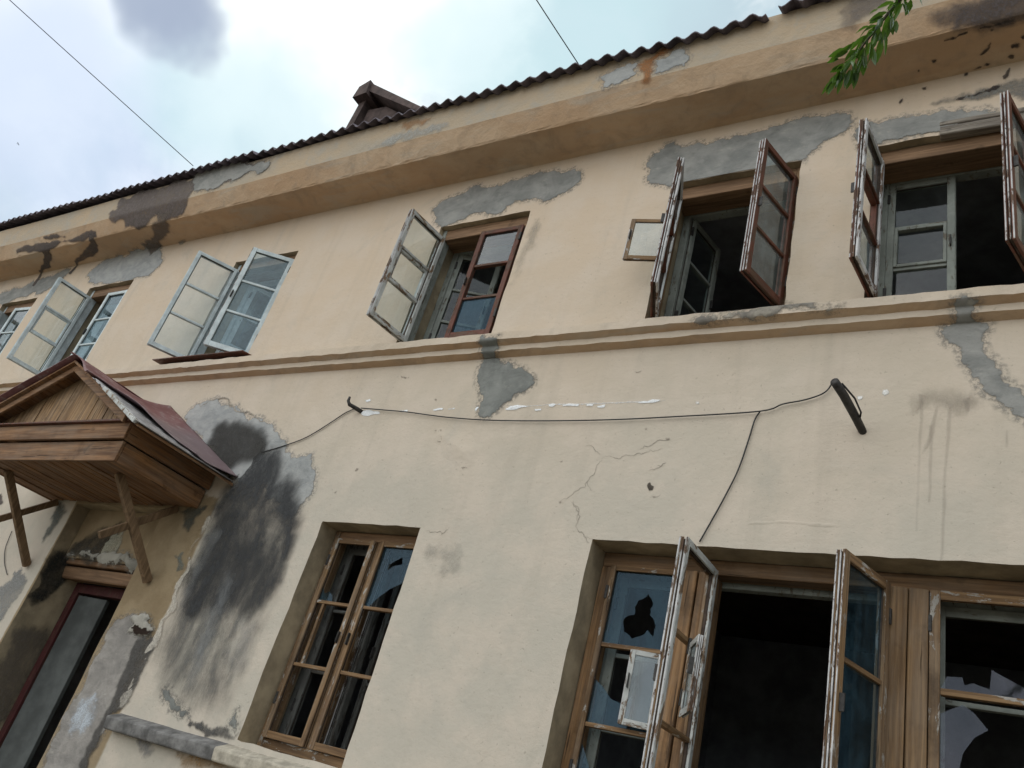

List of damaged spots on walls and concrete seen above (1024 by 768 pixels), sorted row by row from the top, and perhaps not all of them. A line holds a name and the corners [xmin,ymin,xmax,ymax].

corrosion [638,48,669,83]
peeling [655,49,689,73]
water stain [16,230,98,286]
crack [562,439,665,543]
water stain [167,559,262,694]